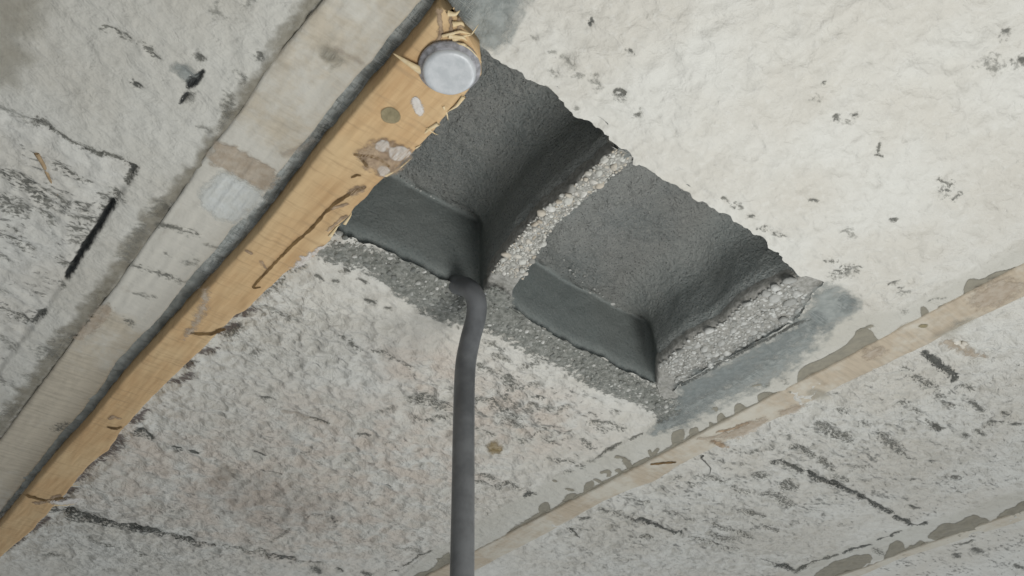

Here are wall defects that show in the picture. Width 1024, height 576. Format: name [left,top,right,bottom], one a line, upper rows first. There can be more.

crack [0,0,322,438]
spalling [492,149,633,280]
spalling [475,339,571,444]